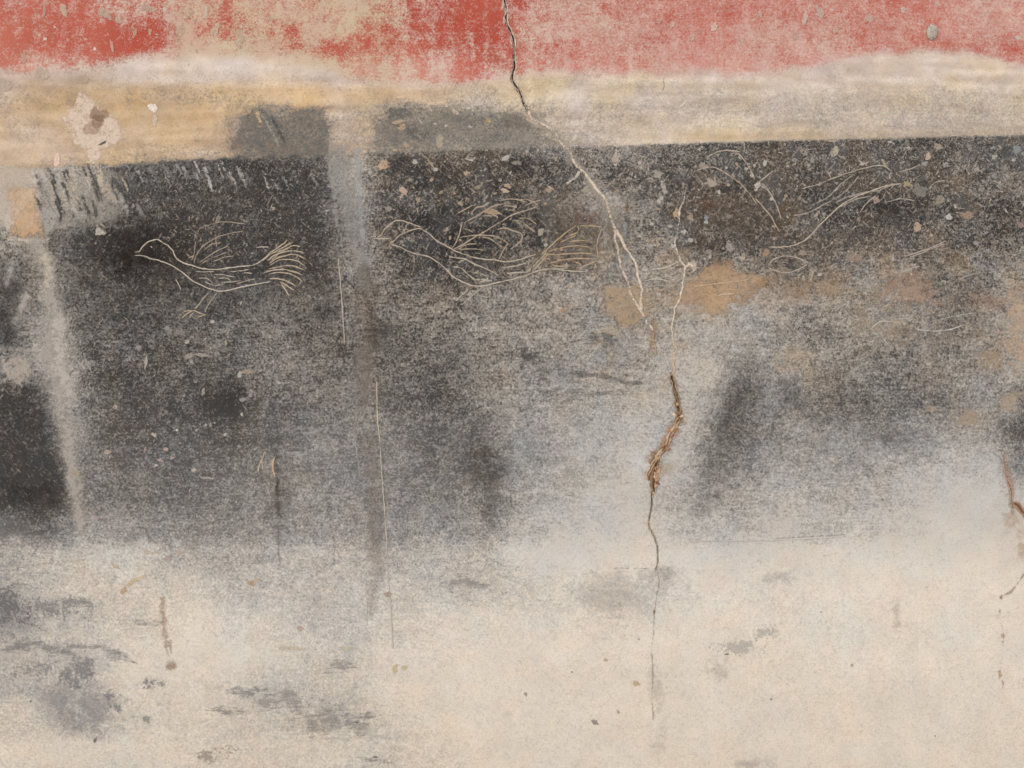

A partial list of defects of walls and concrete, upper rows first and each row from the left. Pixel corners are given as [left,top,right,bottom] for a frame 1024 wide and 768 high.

damp [0,237,86,534]
crack [502,0,696,560]
damp [676,261,774,314]